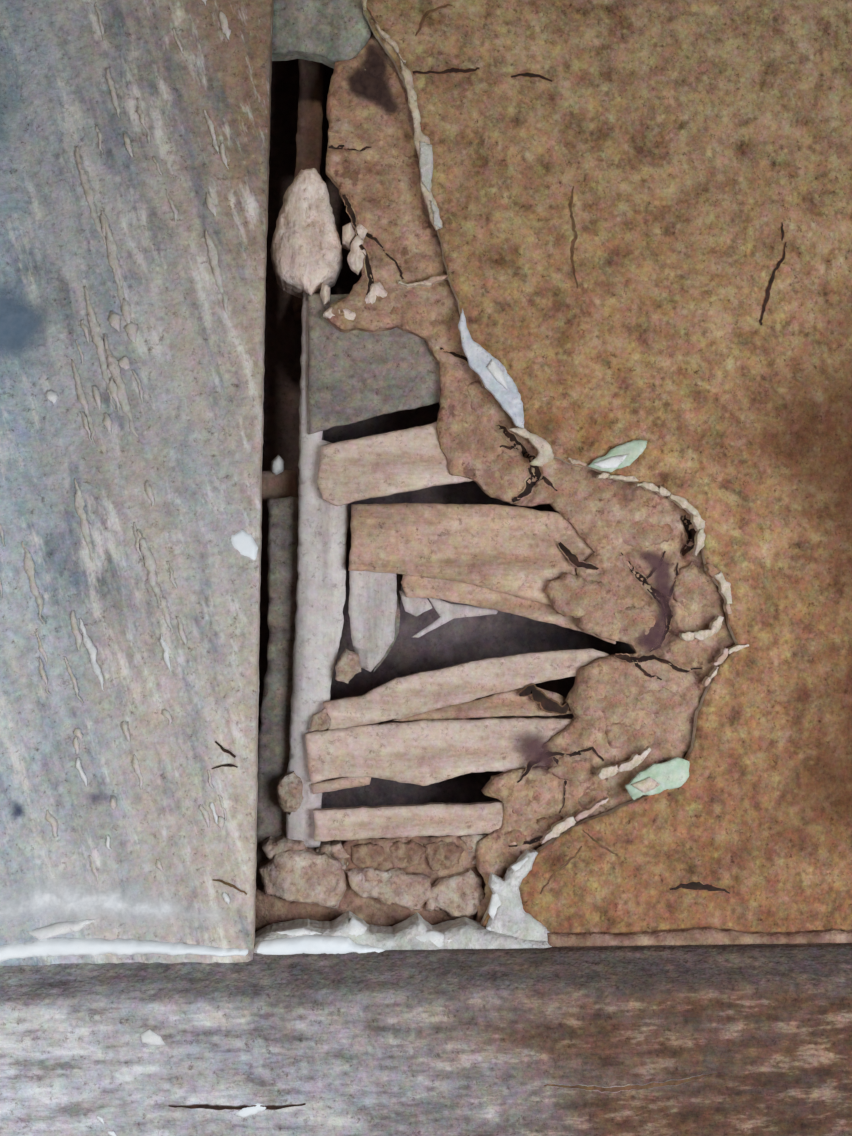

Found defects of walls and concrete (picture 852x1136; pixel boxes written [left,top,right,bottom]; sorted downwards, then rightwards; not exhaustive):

crack [415,4,452,36]
crack [413,67,480,75]
crack [511,72,552,82]
crack [568,186,578,288]
crack [759,222,786,325]
spalling [323,0,749,942]
crack [212,741,238,769]
crack [212,879,247,895]
crack [670,880,730,894]
crack [169,1103,306,1111]